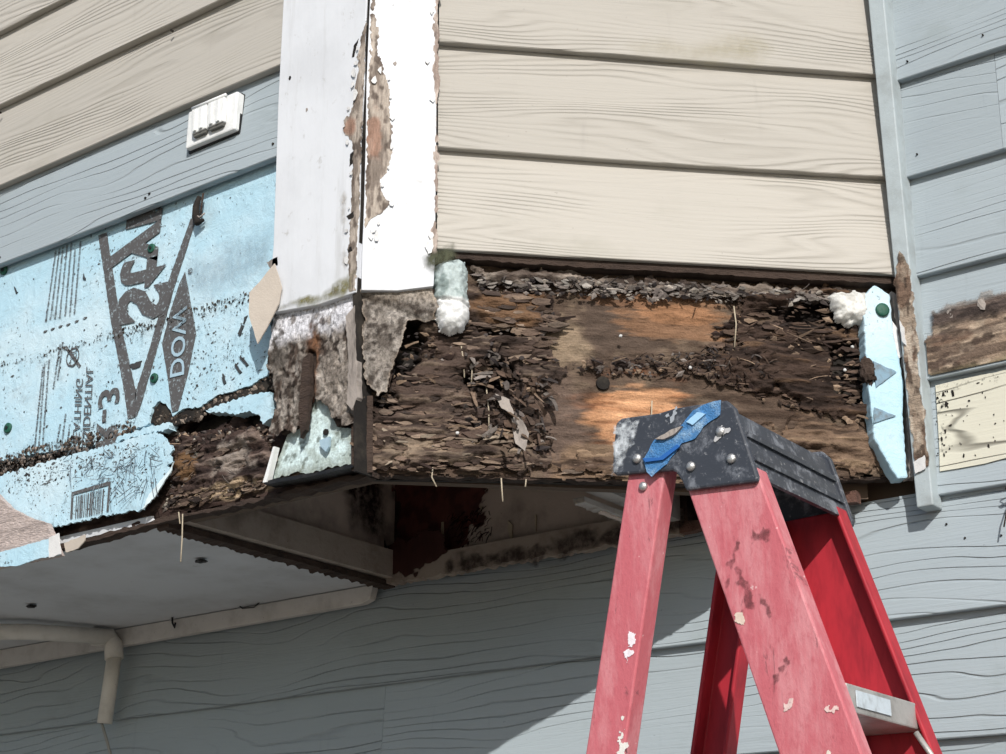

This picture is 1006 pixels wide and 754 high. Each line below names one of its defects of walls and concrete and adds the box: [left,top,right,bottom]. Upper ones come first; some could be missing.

peeling [343,0,395,292]
peeling [495,394,529,451]
leakage [669,511,691,531]
peeling [48,533,86,558]
leakage [447,527,621,572]